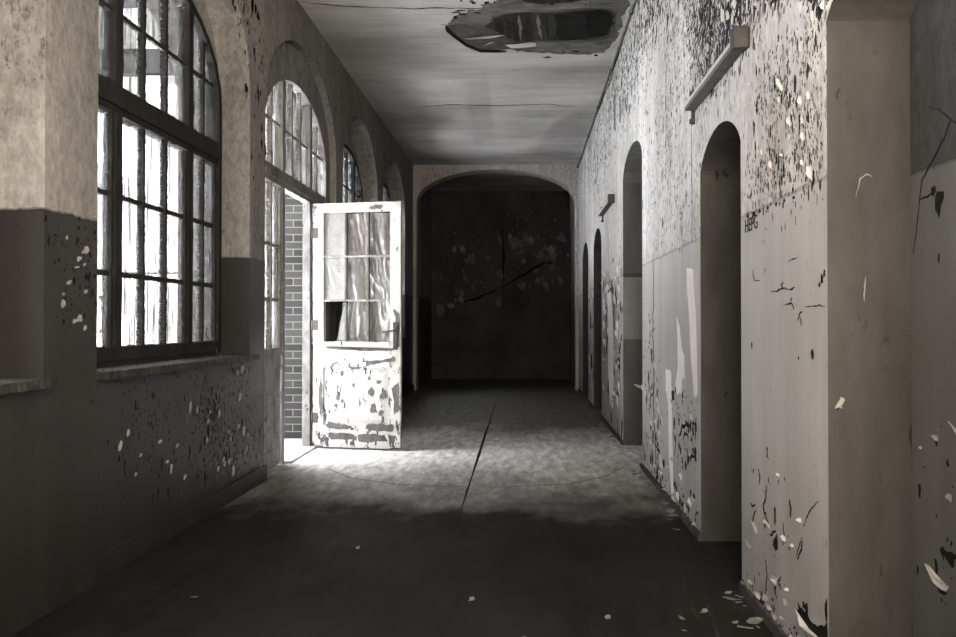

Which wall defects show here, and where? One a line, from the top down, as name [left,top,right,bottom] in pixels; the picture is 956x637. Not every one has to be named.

flaking render [440,0,829,256]
peeling [641,315,698,527]
peeling [741,469,828,637]
peeling [917,537,956,606]